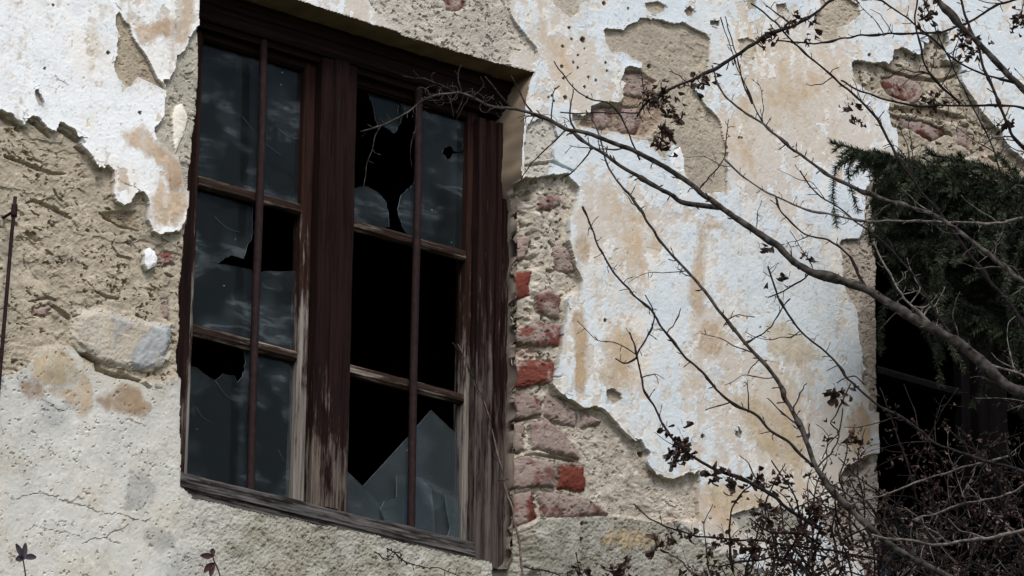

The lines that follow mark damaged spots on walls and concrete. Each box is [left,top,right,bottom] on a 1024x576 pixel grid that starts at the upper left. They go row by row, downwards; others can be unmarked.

spalling [106,12,199,192]
spalling [553,0,743,194]
flaking render [852,27,1024,190]
spalling [0,85,187,384]
flaking render [506,114,701,542]
spalling [839,176,881,413]